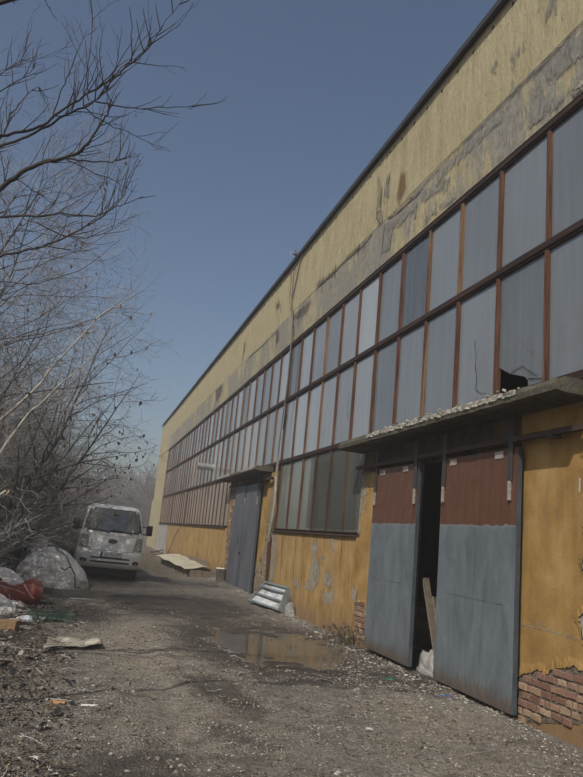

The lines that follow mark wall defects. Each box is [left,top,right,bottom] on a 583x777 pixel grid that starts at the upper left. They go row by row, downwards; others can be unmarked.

crack [423,23,583,186]
peeling [294,534,334,612]
spalling [514,656,583,734]